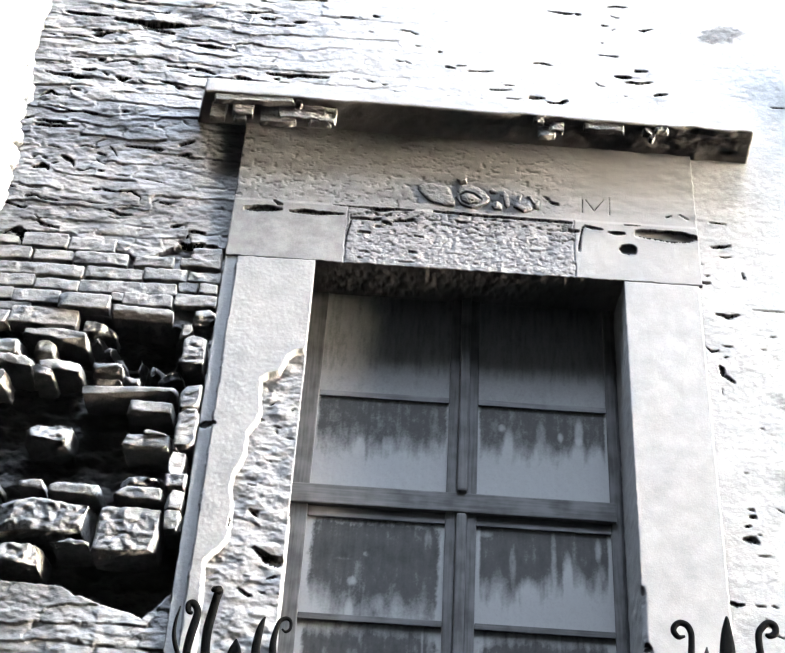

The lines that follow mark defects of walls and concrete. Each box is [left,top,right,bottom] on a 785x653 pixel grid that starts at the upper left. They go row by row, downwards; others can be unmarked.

spalling [0,292,216,584]